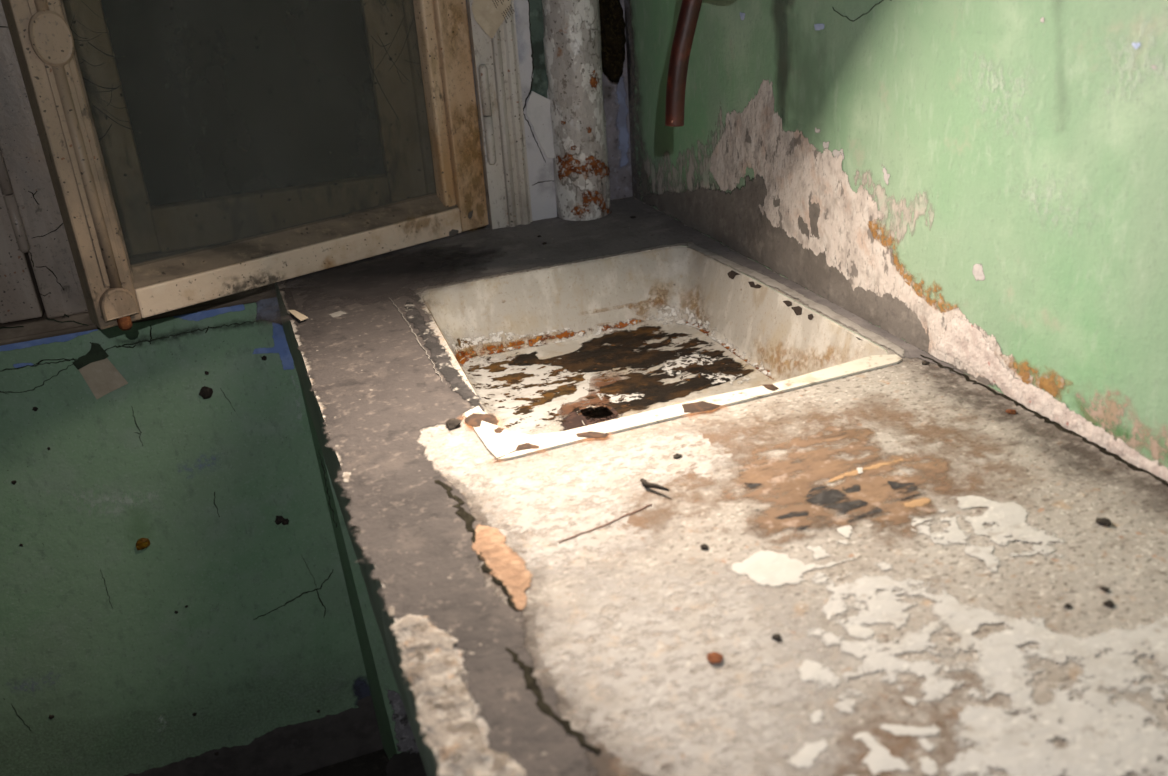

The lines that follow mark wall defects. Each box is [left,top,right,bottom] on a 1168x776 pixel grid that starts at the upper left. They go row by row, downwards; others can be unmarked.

crack [833,0,892,22]
corrosion [556,146,612,219]
peeling [642,79,1168,482]
crack [0,320,267,394]
damp [807,404,1007,496]
crack [253,555,333,620]
spalling [471,524,532,610]
damp [429,419,917,776]
peeling [909,495,1065,572]
spalling [388,606,527,776]
peeling [730,525,1168,776]